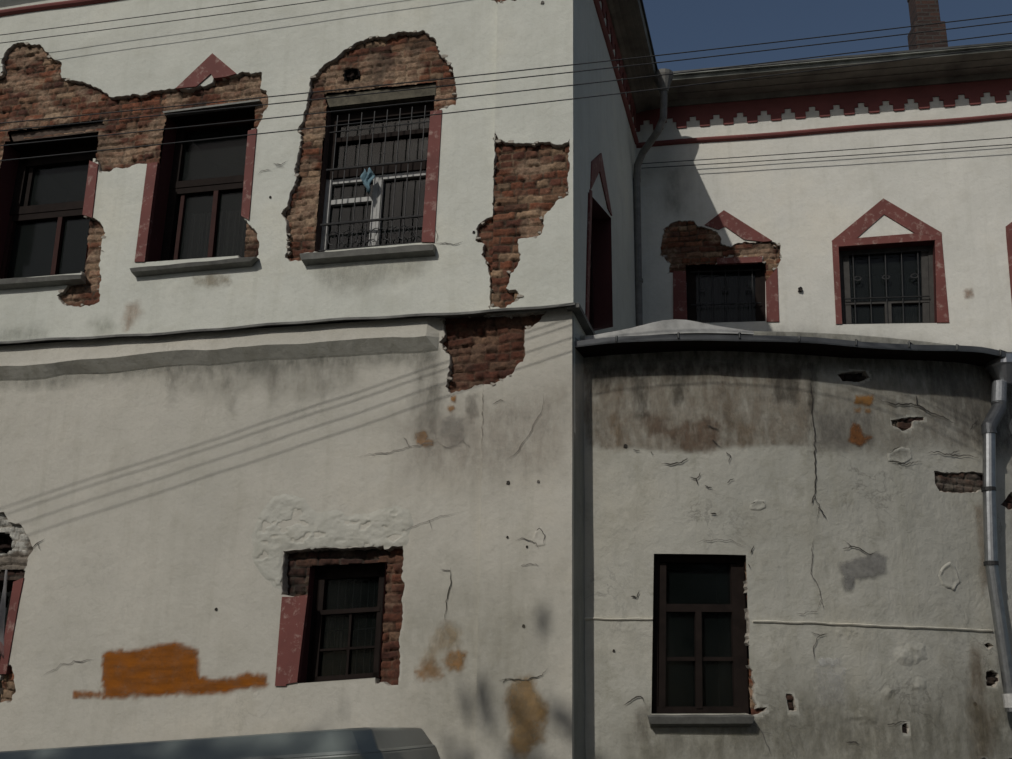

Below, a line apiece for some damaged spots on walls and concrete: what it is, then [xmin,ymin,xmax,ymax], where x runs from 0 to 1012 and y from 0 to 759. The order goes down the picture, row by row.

flaking render [0,42,268,172]
flaking render [281,30,457,261]
flaking render [57,216,106,307]
flaking render [238,220,259,258]
flaking render [439,133,570,440]
flaking render [660,220,782,282]
crack [810,379,827,519]
peeling [848,423,872,446]
flaking render [934,471,983,493]
flaking render [0,512,33,580]
flaking render [281,546,405,686]